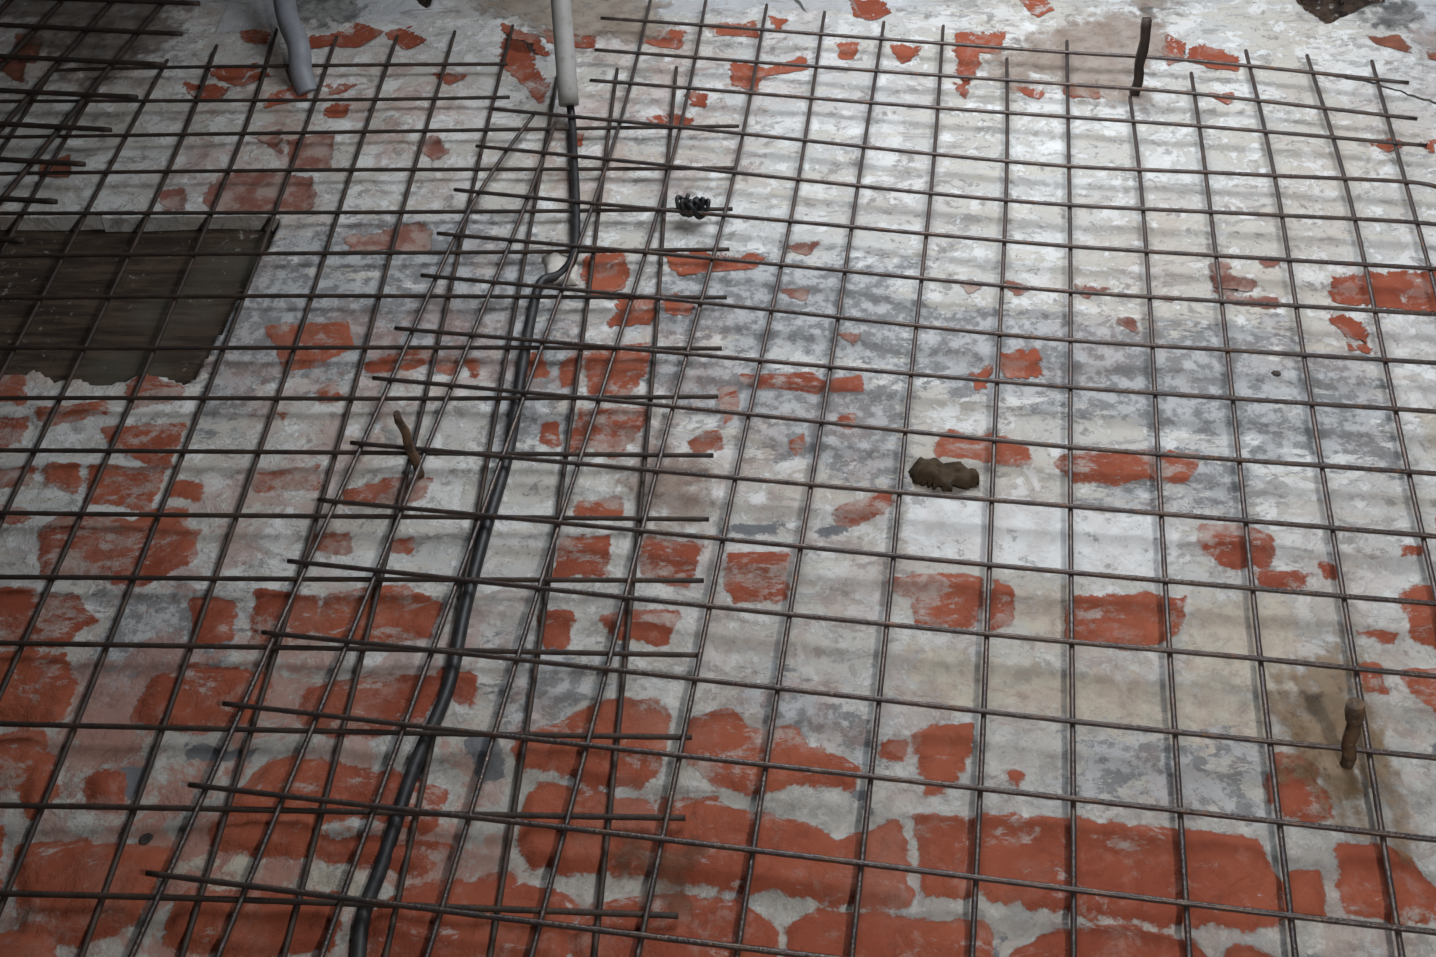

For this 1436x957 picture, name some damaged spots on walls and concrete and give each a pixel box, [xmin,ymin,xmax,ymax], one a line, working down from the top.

peeling [308,21,427,50]
peeling [498,23,554,103]
peeling [849,0,892,20]
peeling [951,31,1006,99]
peeling [1161,34,1240,71]
spalling [1296,0,1385,24]
peeling [156,62,357,211]
peeling [580,253,696,328]
peeling [1209,260,1281,309]
peeling [1326,270,1436,353]
peeling [969,348,1044,393]
corrosion [1263,643,1417,861]